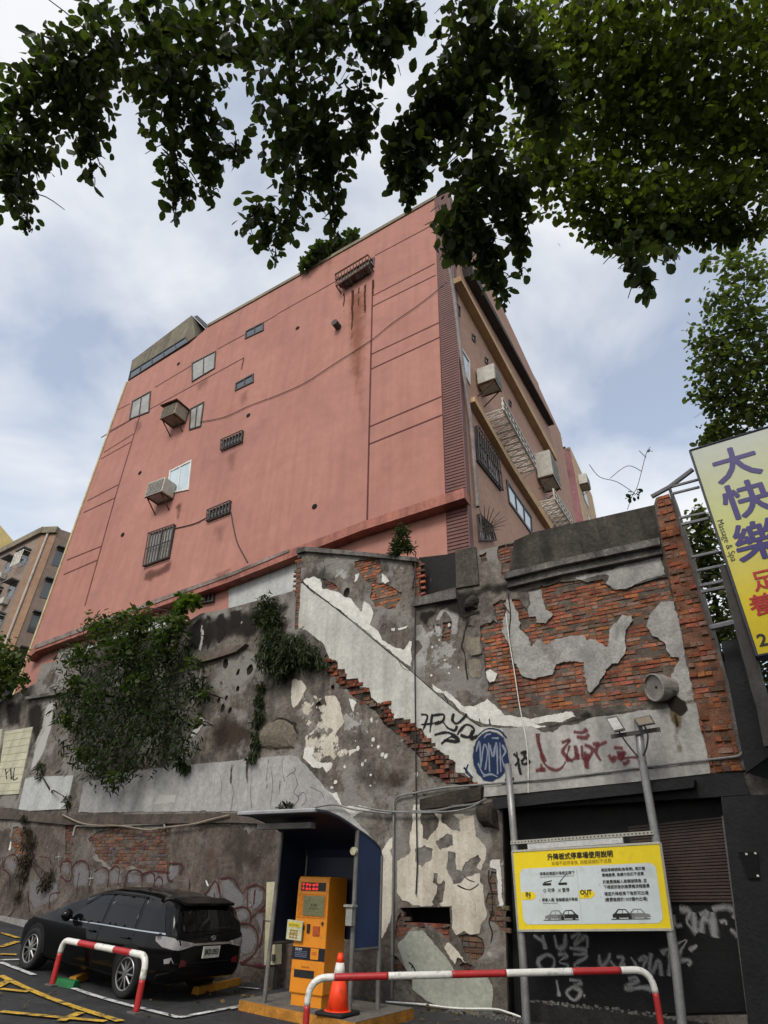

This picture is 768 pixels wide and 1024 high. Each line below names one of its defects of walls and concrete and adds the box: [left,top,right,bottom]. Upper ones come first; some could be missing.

corrosion [343,280,374,339]
flaking render [480,544,514,576]
flaking render [78,557,708,839]
flaking render [88,827,171,874]
peeling [381,804,512,1013]